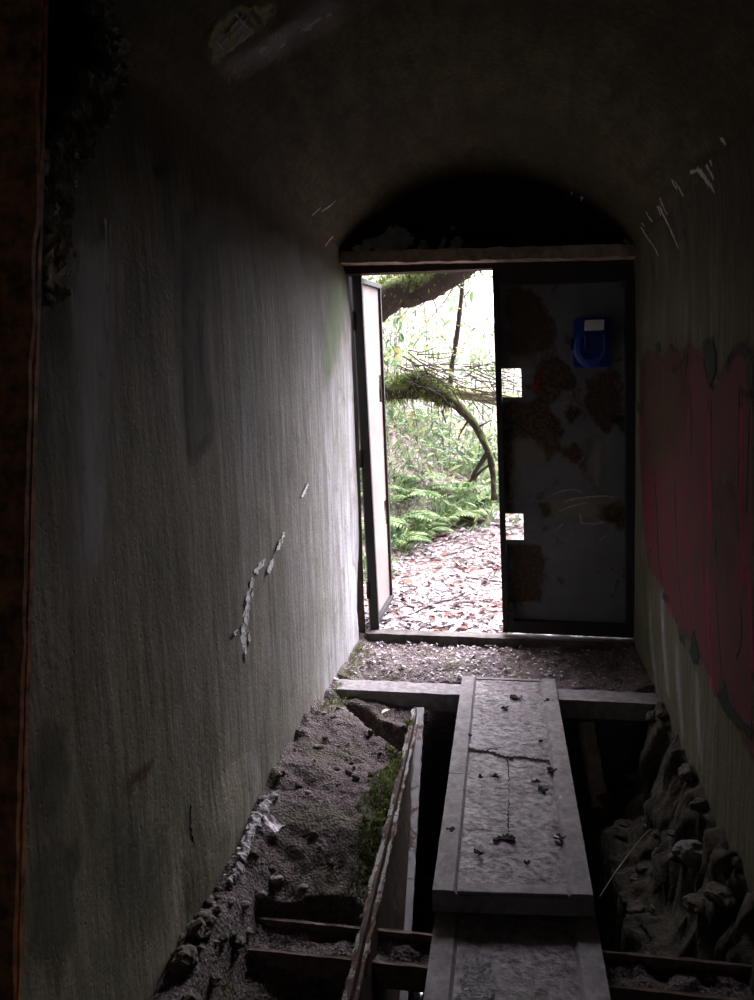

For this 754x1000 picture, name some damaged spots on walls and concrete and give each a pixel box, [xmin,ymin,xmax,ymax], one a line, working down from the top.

flaking render [208,3,275,62]
flaking render [233,532,285,663]
crack [449,748,549,832]